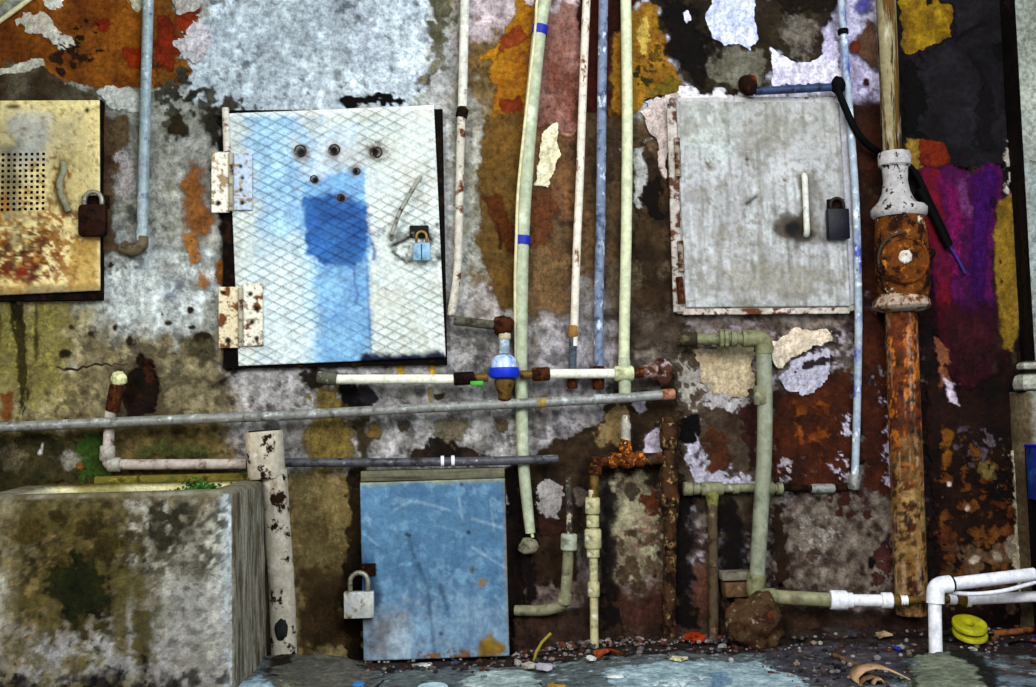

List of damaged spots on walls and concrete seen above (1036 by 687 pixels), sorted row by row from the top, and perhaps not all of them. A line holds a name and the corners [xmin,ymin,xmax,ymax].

peeling [0,0,211,113]
spalling [193,105,223,152]
peeling [477,0,536,128]
peeling [534,122,577,187]
peeling [576,0,771,179]
spalling [214,213,223,285]
water stain [0,301,74,420]
spalling [185,307,238,387]
rust [771,307,891,496]
spalling [517,304,757,620]
water stain [0,509,179,687]
water stain [146,499,215,589]